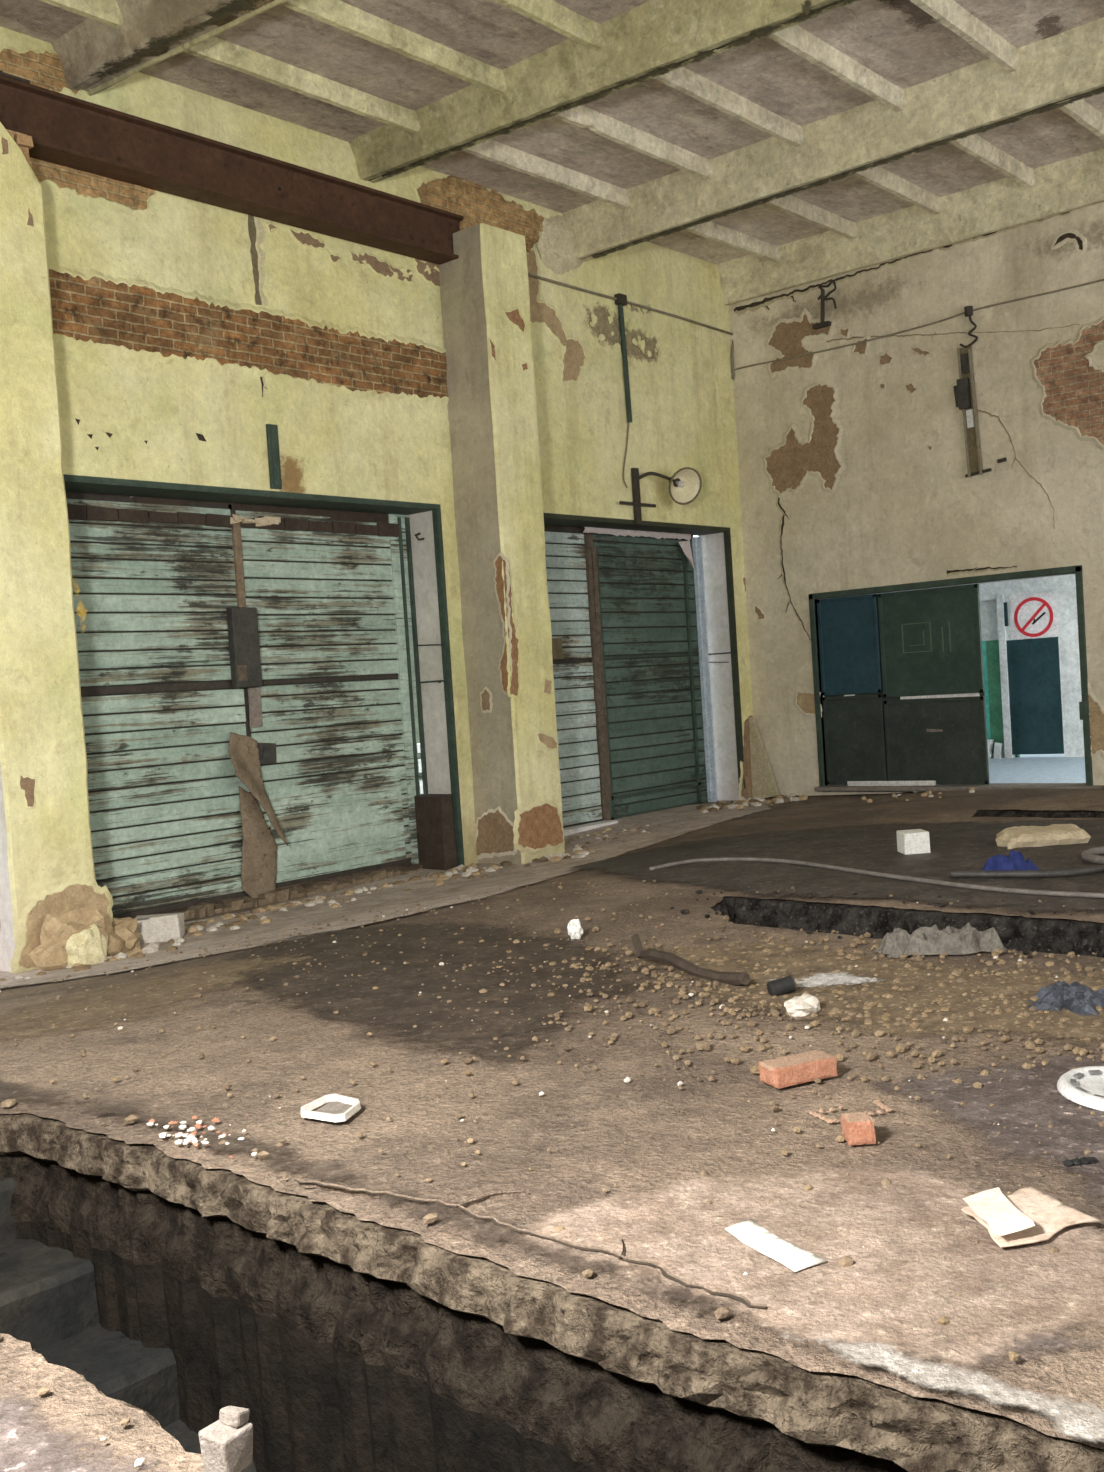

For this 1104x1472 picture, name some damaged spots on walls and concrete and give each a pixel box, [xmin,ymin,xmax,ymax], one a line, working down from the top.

flaking render [0,45,81,98]
flaking render [48,262,449,404]
spalling [488,337,497,363]
spalling [502,305,527,336]
flaking render [1029,315,1104,450]
spalling [480,553,520,713]
crack [776,495,811,641]
spalling [476,798,565,859]
spalling [10,879,113,973]
crack [294,1178,767,1308]